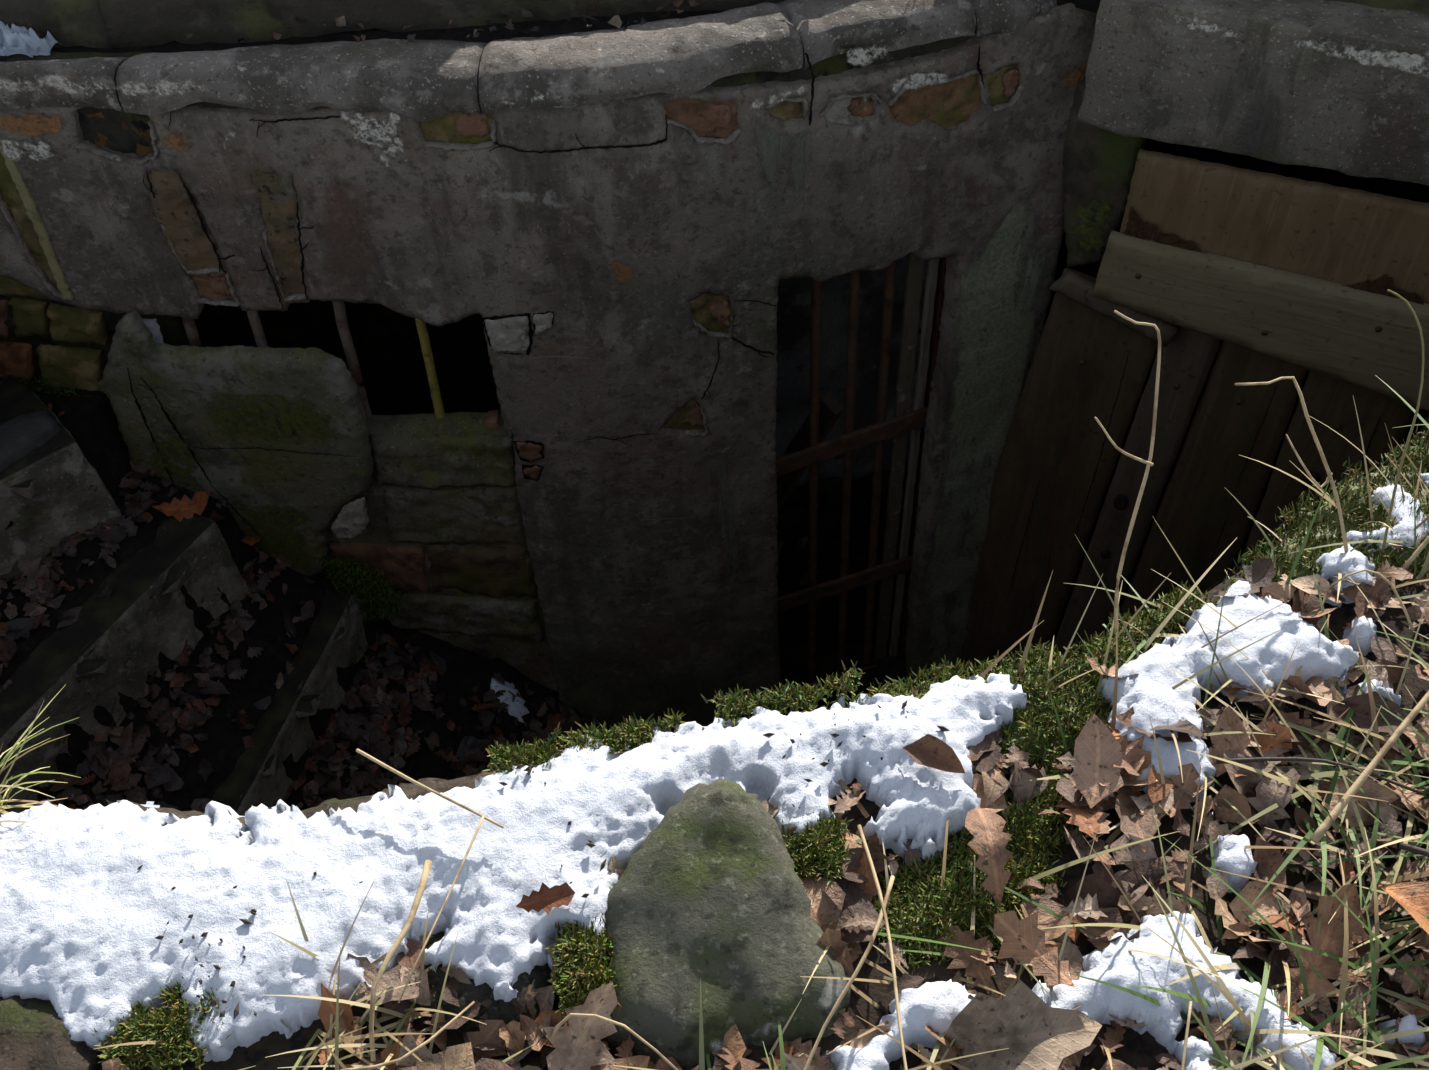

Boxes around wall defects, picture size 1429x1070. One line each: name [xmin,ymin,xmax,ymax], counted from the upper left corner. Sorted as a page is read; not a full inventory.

crack [249,116,342,137]
spalling [420,112,496,152]
crack [489,114,668,154]
spalling [665,98,742,145]
spalling [765,96,809,123]
spalling [888,64,1025,129]
crack [143,171,315,310]
spalling [481,311,554,355]
spalling [688,293,735,338]
crack [127,368,357,541]